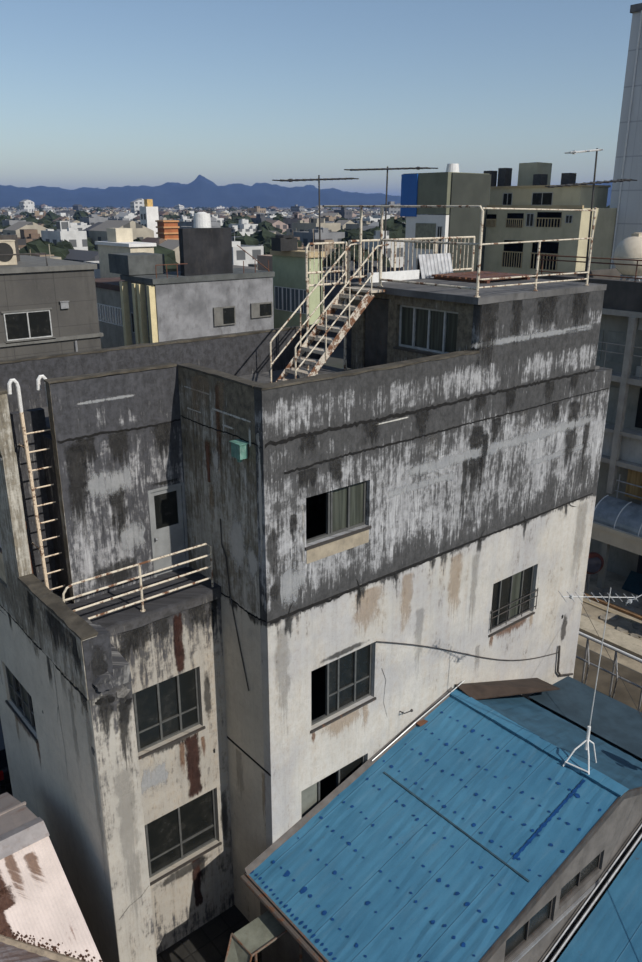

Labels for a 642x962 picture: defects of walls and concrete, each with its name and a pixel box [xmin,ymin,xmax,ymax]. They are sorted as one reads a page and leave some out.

water stain [475,292,591,371]
water stain [78,395,134,405]
water stain [298,468,317,488]
crack [57,369,609,484]
water stain [388,401,591,518]
water stain [65,447,145,583]
water stain [267,531,305,603]
rust [173,613,185,672]
water stain [99,695,131,762]
rust [180,732,205,797]
rust [0,853,41,938]